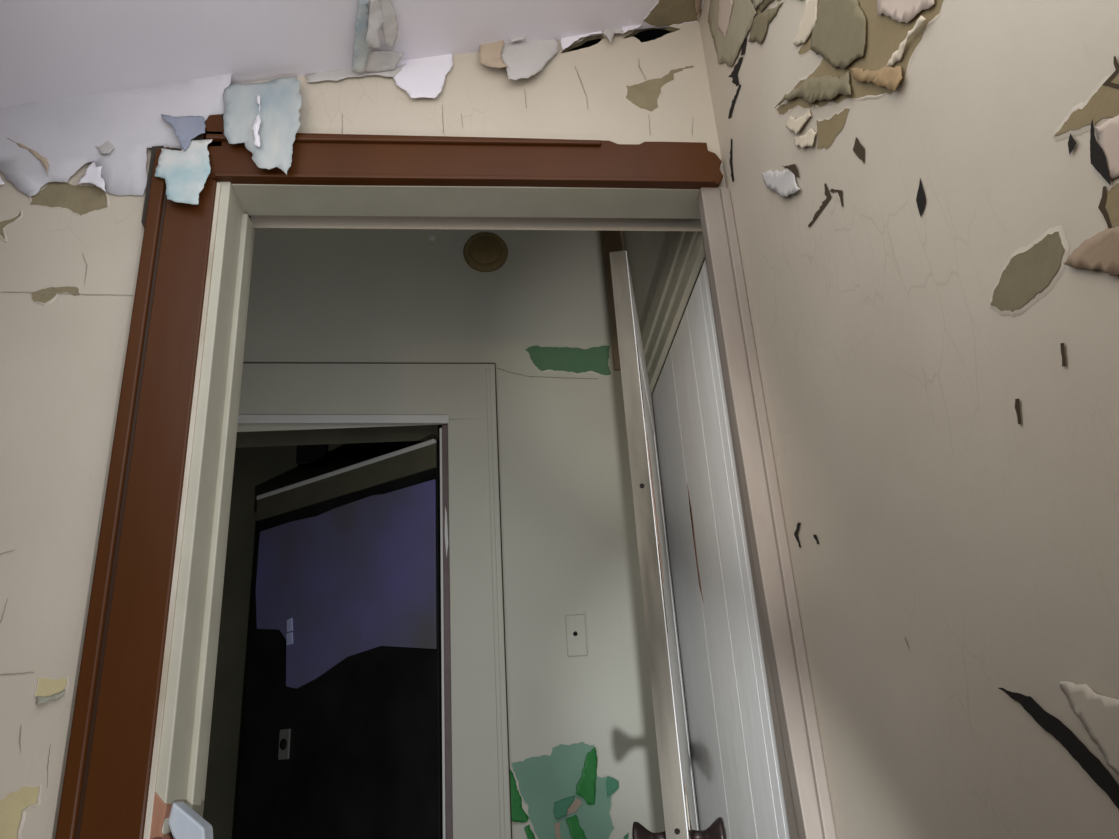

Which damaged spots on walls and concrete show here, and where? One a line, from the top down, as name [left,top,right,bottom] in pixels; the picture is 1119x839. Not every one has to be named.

peeling [352,0,453,98]
peeling [479,0,784,80]
peeling [625,64,696,113]
peeling [775,0,945,152]
peeling [762,164,800,197]
peeling [989,56,1119,318]
peeling [524,344,612,376]
peeling [0,74,302,839]
peeling [509,741,629,839]
peeling [998,681,1119,809]